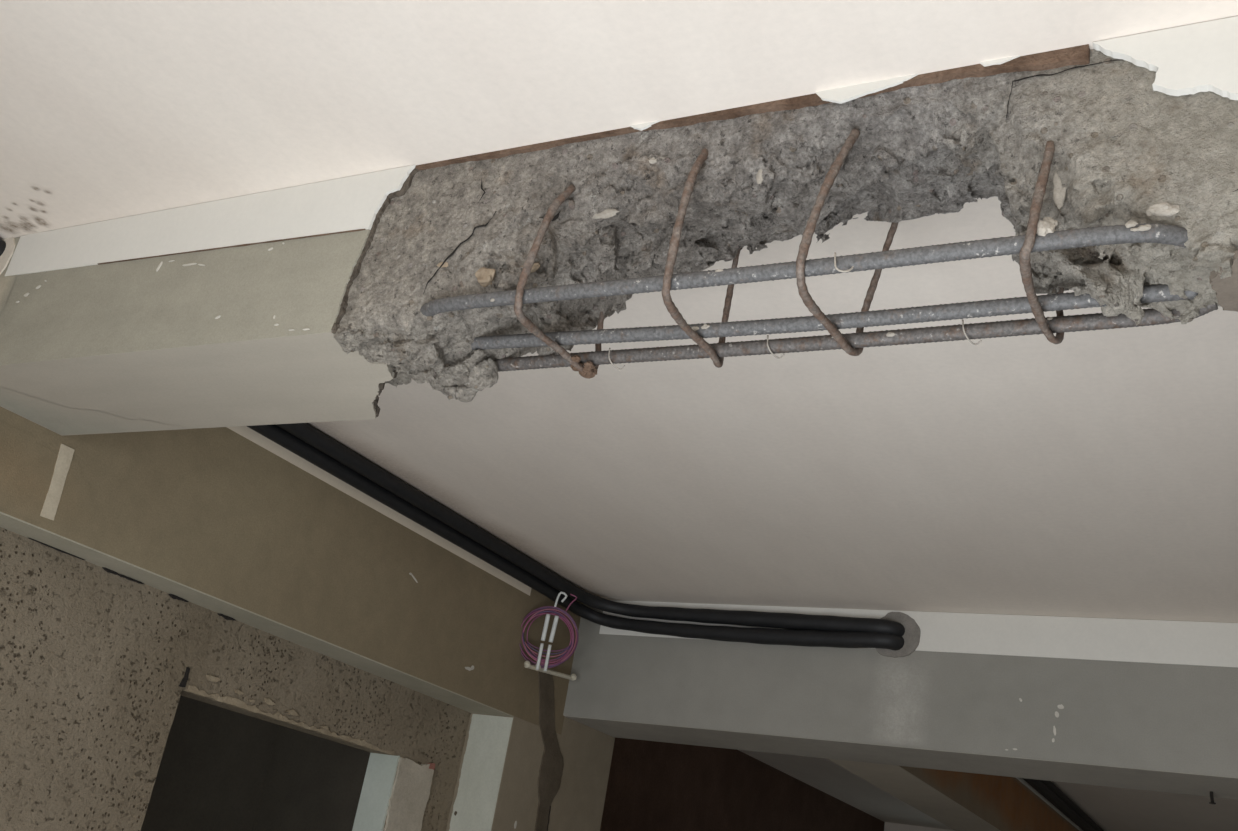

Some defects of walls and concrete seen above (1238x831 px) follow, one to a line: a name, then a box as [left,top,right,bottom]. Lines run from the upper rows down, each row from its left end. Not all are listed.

damp [0,185,54,236]
spalling [331,44,1238,417]